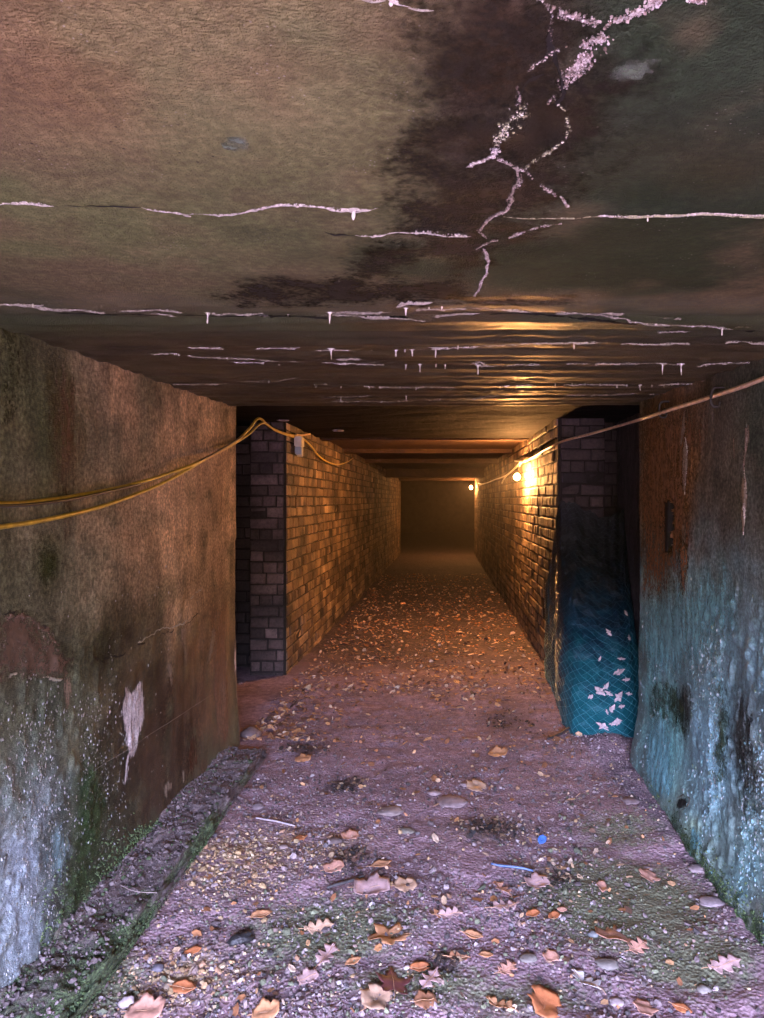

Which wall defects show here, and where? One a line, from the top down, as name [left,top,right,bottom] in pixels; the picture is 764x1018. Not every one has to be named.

crack [0,0,764,403]
damp [212,0,663,309]
damp [0,635,165,987]
damp [631,566,764,910]